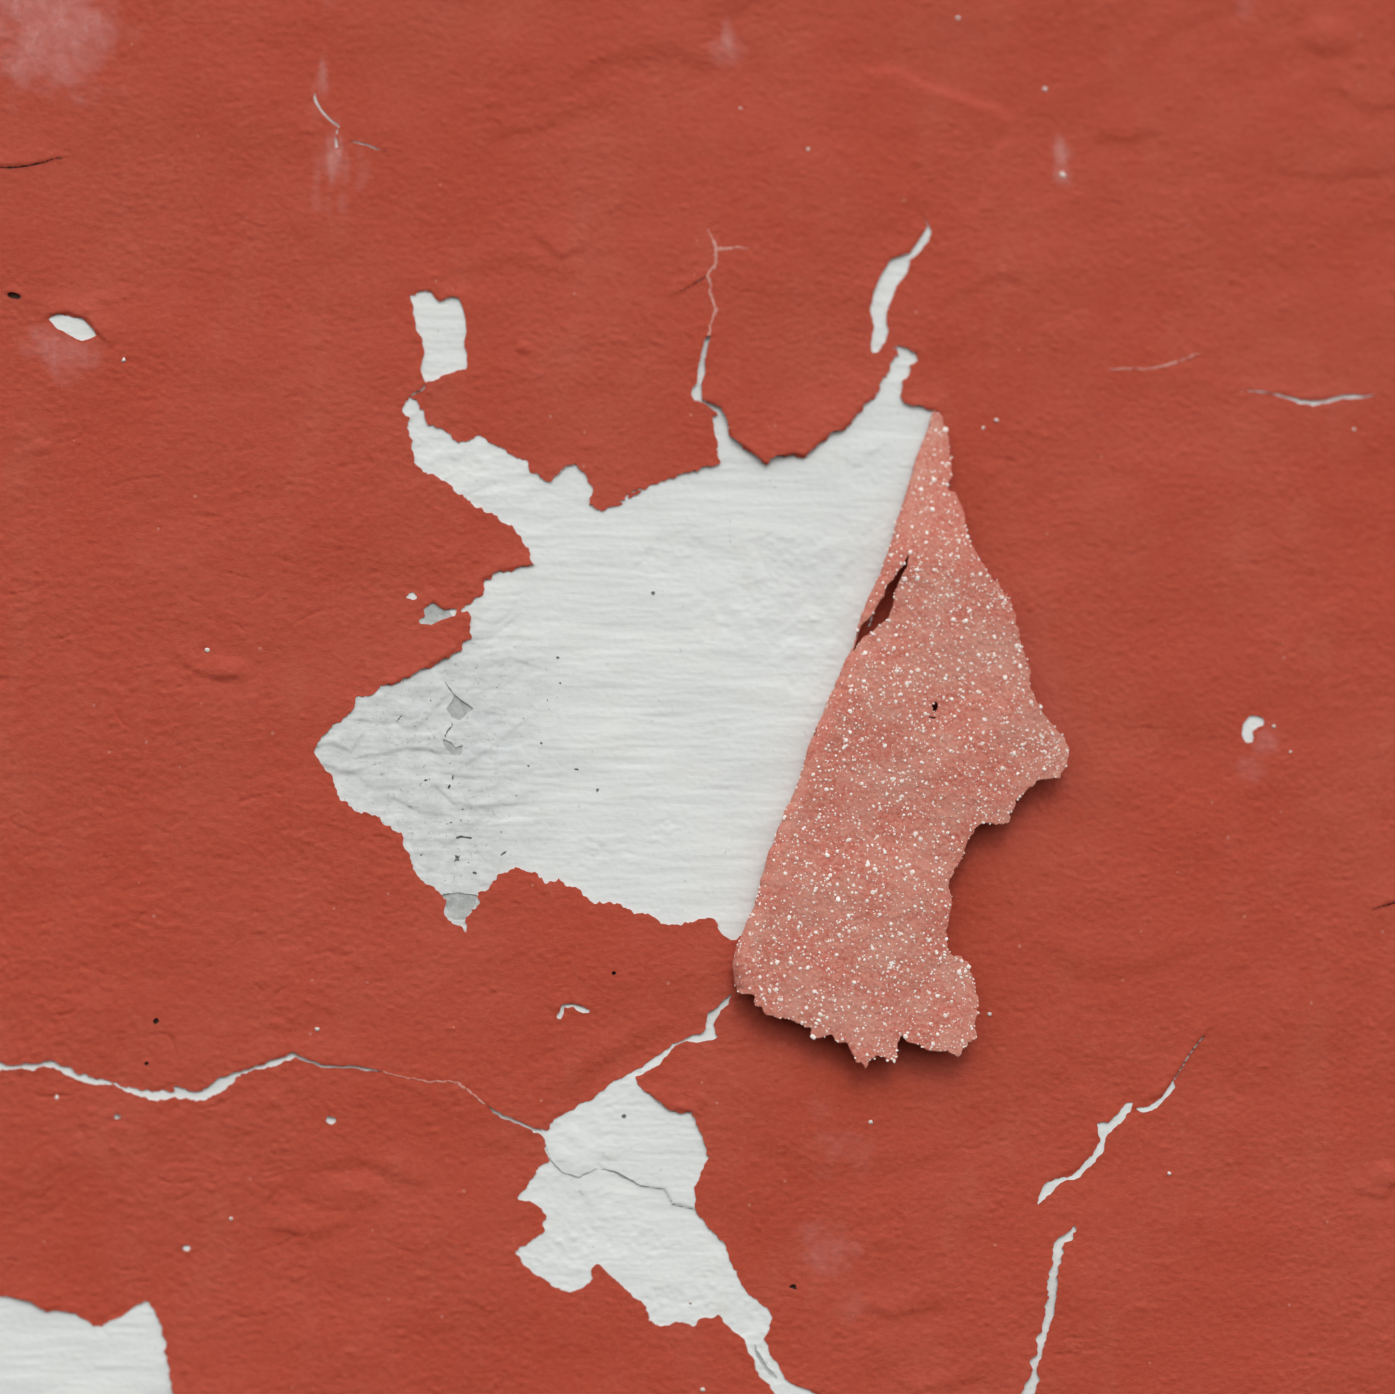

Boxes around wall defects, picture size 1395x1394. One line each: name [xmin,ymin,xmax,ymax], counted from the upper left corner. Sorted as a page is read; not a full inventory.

peeling [49,314,96,341]
peeling [1242,715,1264,743]
peeling [314,217,1069,1394]
crack [0,1052,534,1129]
crack [1038,1036,1204,1204]
peeling [0,1296,173,1394]
crack [1021,1226,1076,1394]